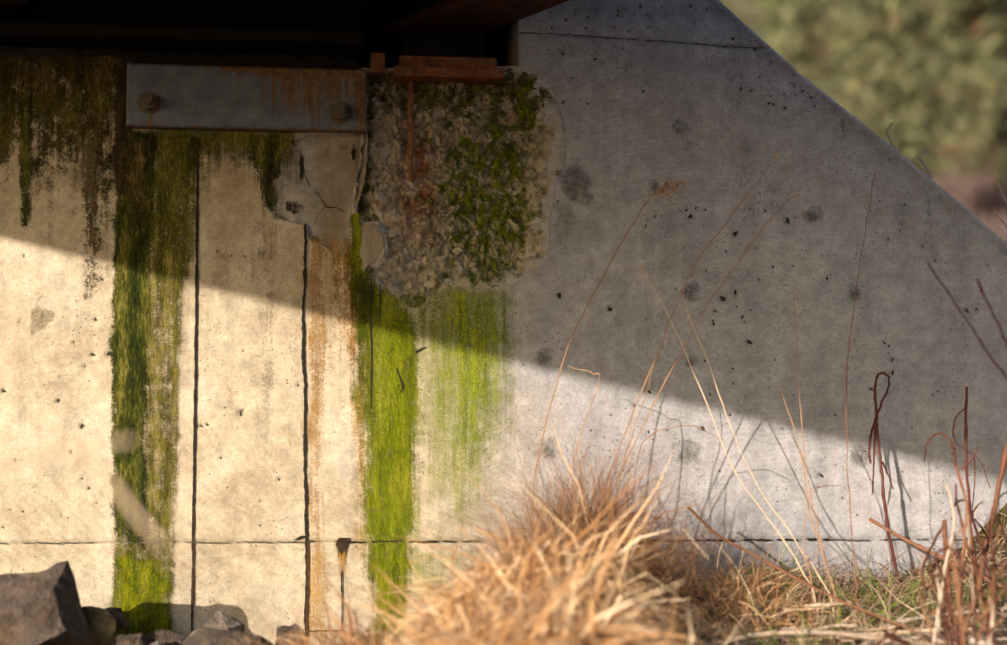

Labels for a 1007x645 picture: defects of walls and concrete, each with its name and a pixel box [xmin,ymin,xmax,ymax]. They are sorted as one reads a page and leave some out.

damp [18,96,34,229]
damp [248,134,293,182]
spalling [259,46,579,321]
damp [74,61,211,644]
crack [0,139,519,635]
corrosion [307,239,354,475]
damp [335,220,511,639]
corrosion [308,535,327,637]